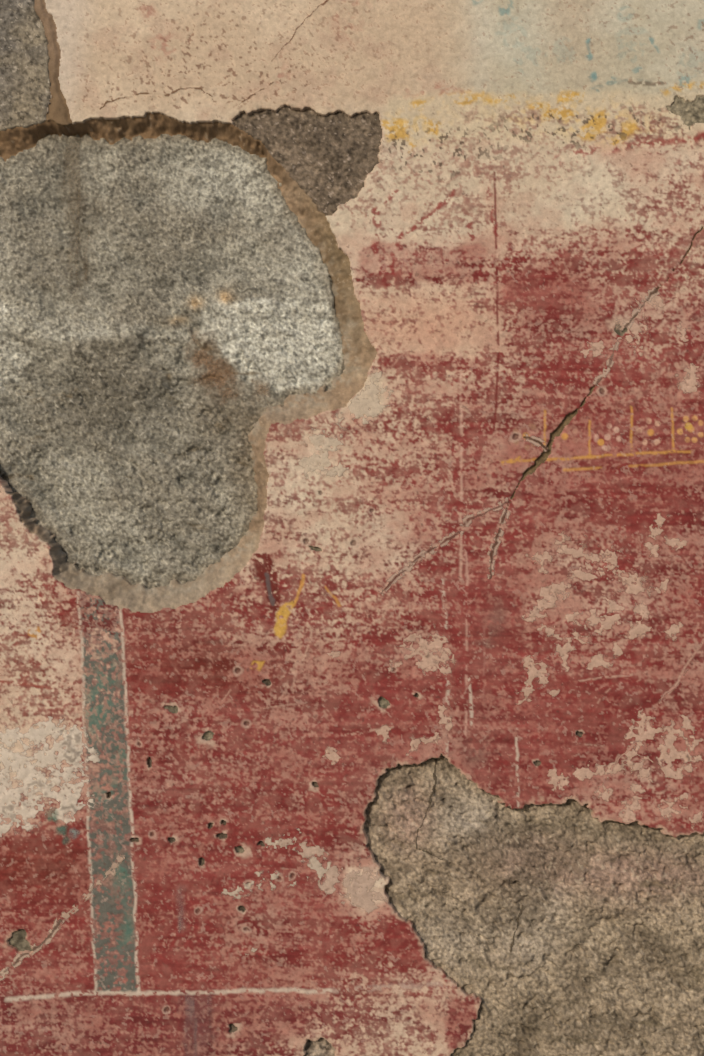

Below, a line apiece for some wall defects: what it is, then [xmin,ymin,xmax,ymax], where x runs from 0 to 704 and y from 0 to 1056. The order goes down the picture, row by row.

crack [100,87,212,110]
crack [242,0,328,102]
spalling [666,96,704,130]
spalling [0,0,393,613]
crack [380,227,704,596]
peeling [388,633,454,676]
spalling [223,705,704,1056]